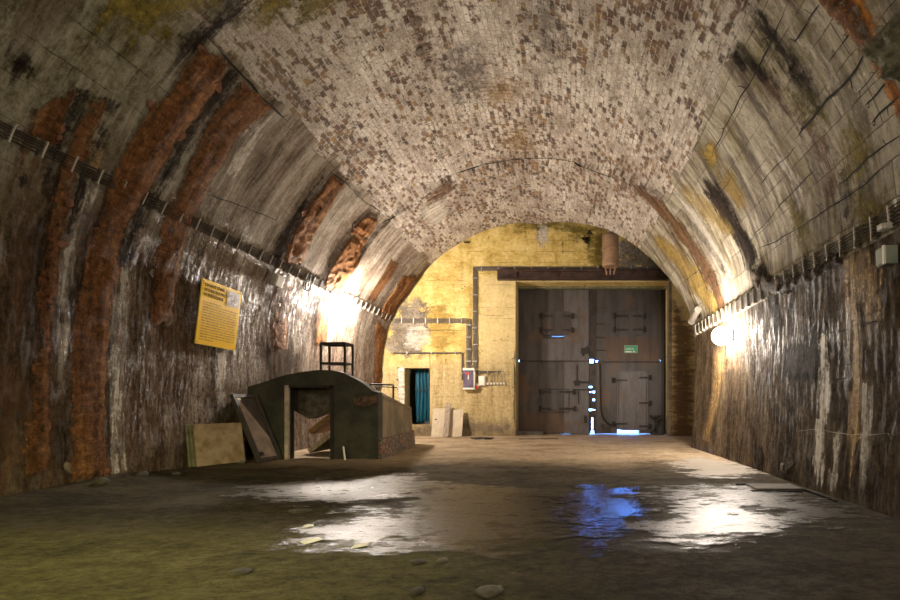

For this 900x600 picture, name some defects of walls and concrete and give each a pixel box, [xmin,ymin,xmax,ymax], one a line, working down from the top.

leakage [66,123,107,233]
crack [446,156,628,185]
leakage [729,2,894,242]
crack [751,56,900,249]
leakage [103,64,239,460]
rust [632,182,726,326]
leakage [678,195,735,285]
leakage [704,180,768,288]
leakage [811,233,882,319]
leakage [766,293,839,487]
efflorescence [861,382,871,458]